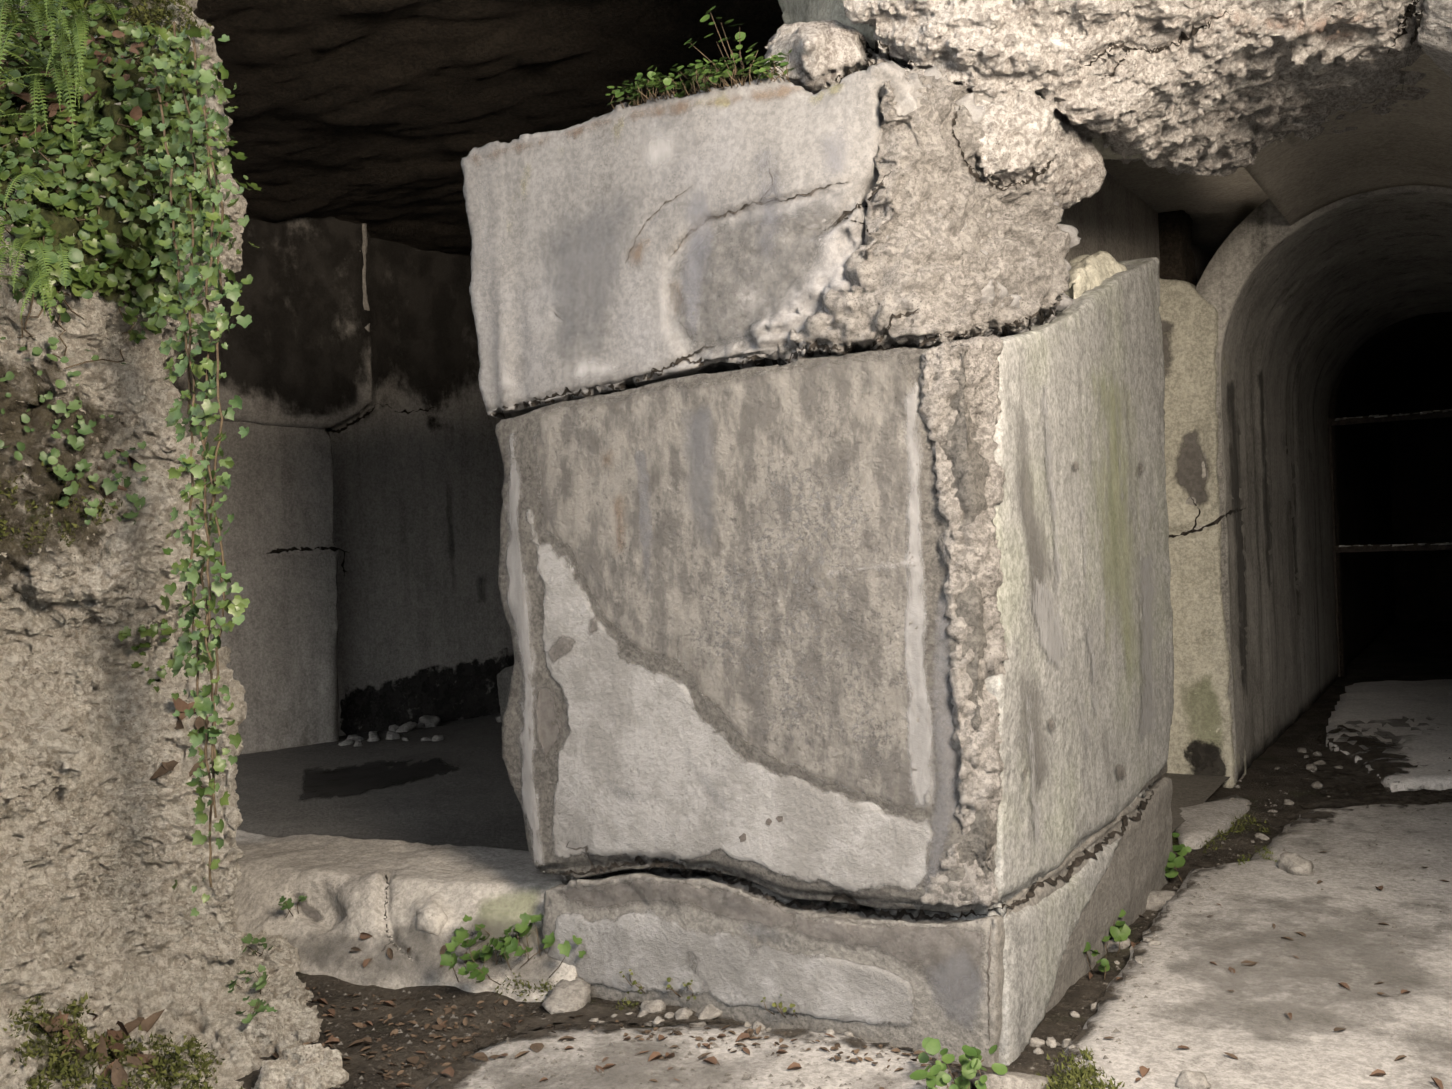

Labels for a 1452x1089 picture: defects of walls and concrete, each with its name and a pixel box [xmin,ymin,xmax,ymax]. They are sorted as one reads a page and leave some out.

crack [1387,0,1425,95]
crack [625,169,892,263]
flaking render [536,71,1071,908]
crack [1169,498,1245,538]
damp [1184,740,1226,788]
spalling [564,879,984,1002]
crack [543,790,1154,1045]